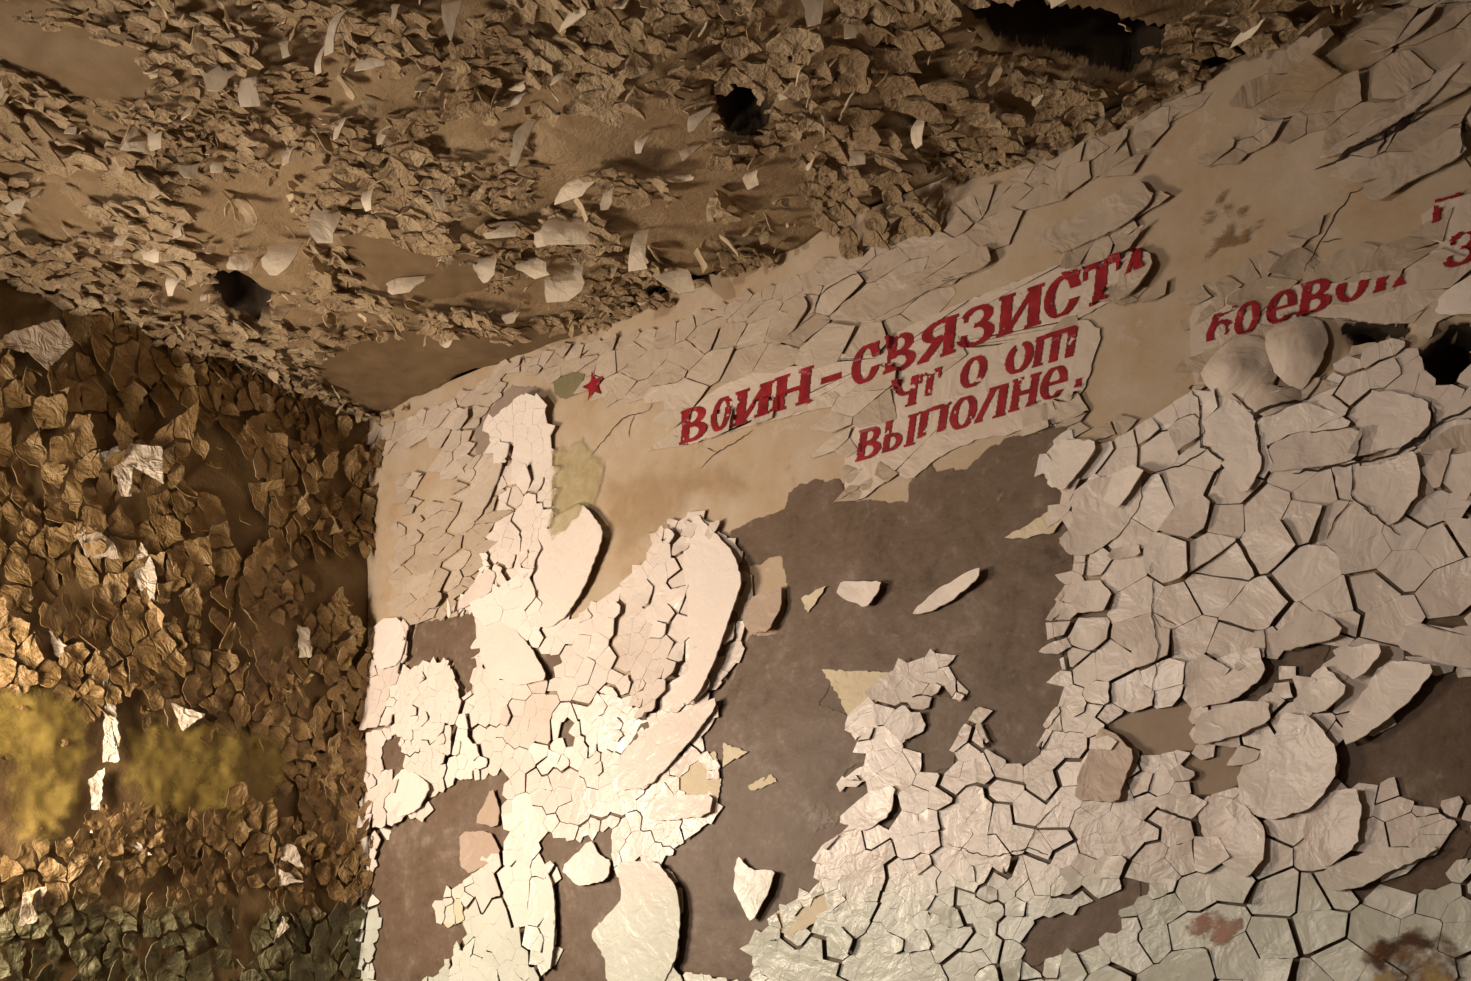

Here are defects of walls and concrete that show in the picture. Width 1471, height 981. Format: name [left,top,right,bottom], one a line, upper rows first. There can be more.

peeling [1126,0,1471,200]
peeling [1178,194,1471,357]
crack [1304,103,1471,271]
peeling [0,0,787,763]
spalling [121,0,1296,981]
crack [1143,374,1326,486]
peeling [1256,348,1471,678]
crack [1293,405,1471,538]
crack [1150,563,1175,692]
peeling [0,768,367,981]
crack [947,801,1061,860]
peeling [1293,674,1471,981]